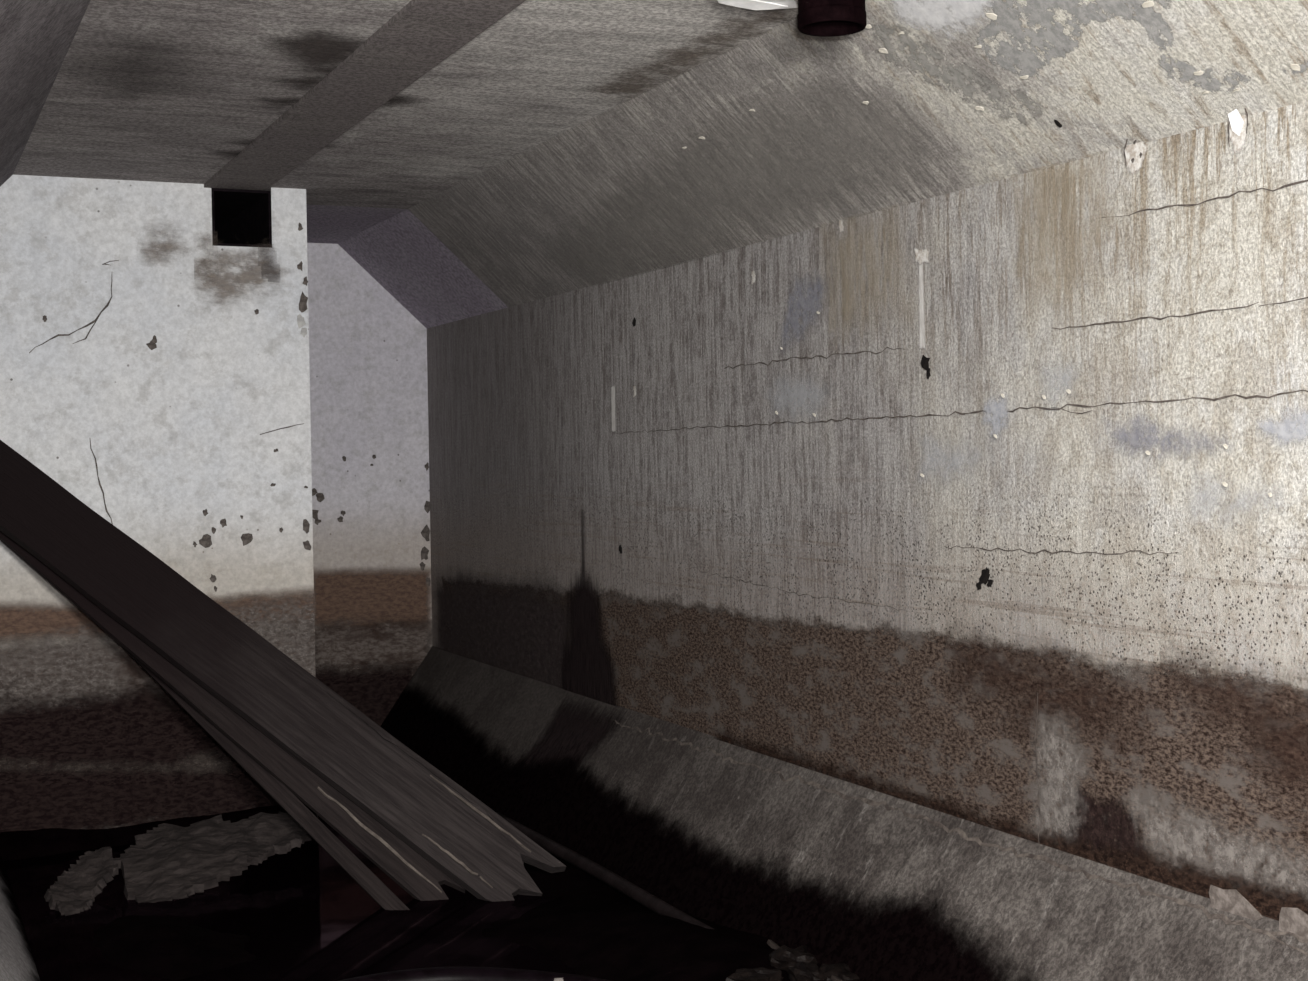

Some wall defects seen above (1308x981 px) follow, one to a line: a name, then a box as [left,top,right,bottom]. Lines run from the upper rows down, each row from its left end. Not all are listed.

peeling [865,0,1250,124]
peeling [1283,59,1308,74]
peeling [1228,109,1244,136]
crack [1228,108,1248,147]
crack [1102,180,1308,218]
water stain [146,243,177,258]
water stain [197,254,279,298]
crack [29,260,119,353]
crack [1052,297,1308,330]
crack [610,390,1308,434]
water stain [212,526,1308,902]